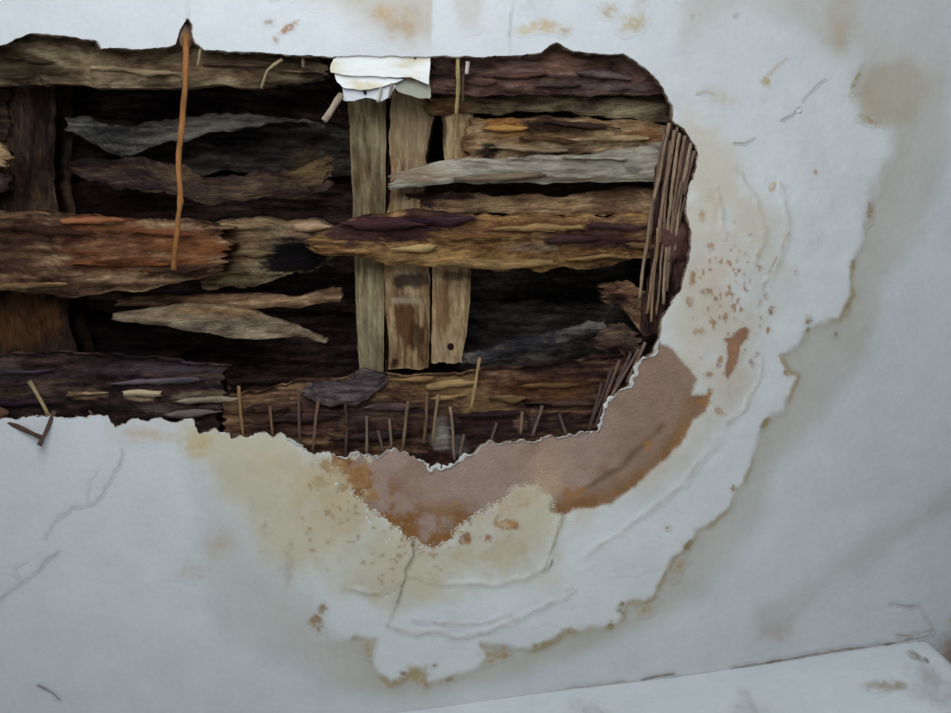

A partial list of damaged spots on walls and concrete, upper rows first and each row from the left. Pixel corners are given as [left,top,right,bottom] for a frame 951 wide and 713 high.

spalling [0,19,761,554]
damp [197,0,951,713]
spalling [765,304,776,334]